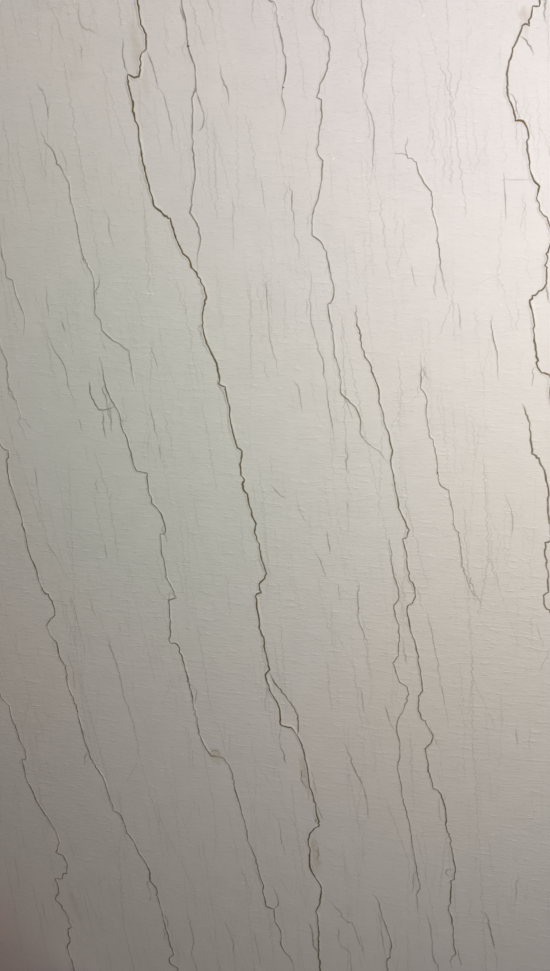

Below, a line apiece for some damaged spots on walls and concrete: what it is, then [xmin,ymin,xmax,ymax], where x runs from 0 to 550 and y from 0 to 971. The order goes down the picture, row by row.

crack [0,234,179,971]
crack [41,0,324,971]
crack [309,0,458,971]
crack [418,355,477,604]
crack [490,315,500,381]
crack [502,0,550,611]